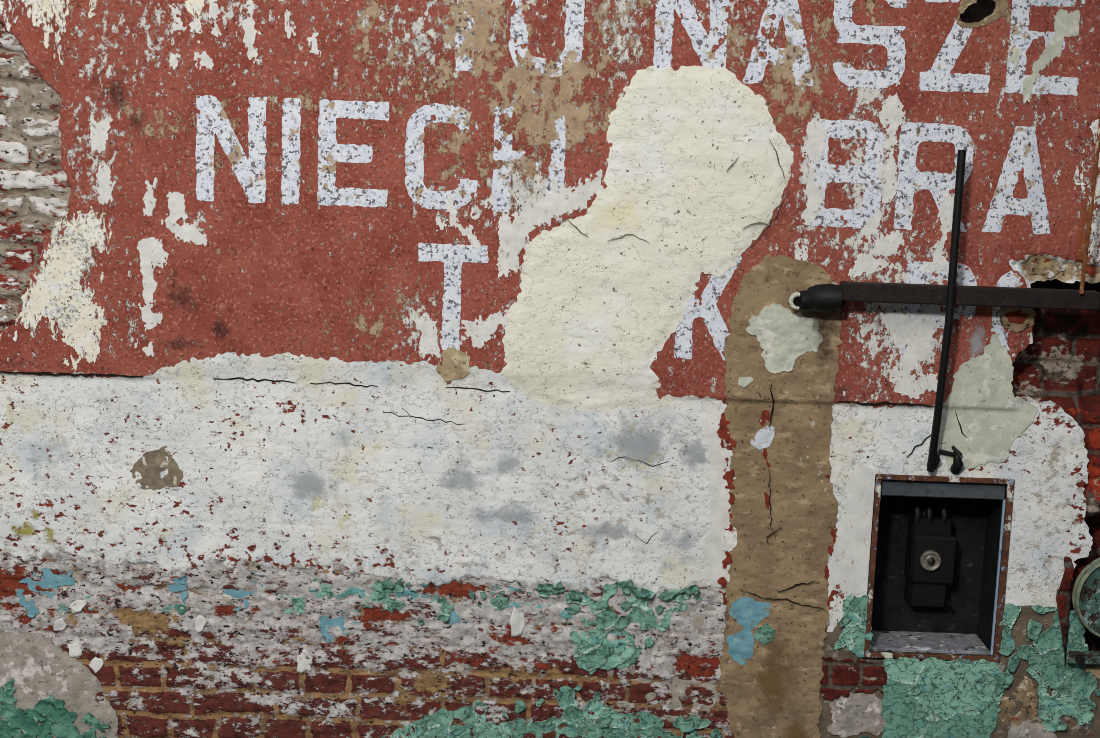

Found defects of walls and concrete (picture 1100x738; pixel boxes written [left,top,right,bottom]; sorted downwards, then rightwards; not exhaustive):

peeling [168,0,222,70]
peeling [242,0,261,65]
peeling [1007,7,1081,104]
flaking render [0,0,116,374]
peeling [134,177,207,357]
peeling [435,169,608,281]
crack [213,377,378,387]
crack [383,408,463,425]
peeling [404,306,509,381]
crack [446,385,510,393]
flaking render [0,399,737,738]
peeling [977,603,1100,733]